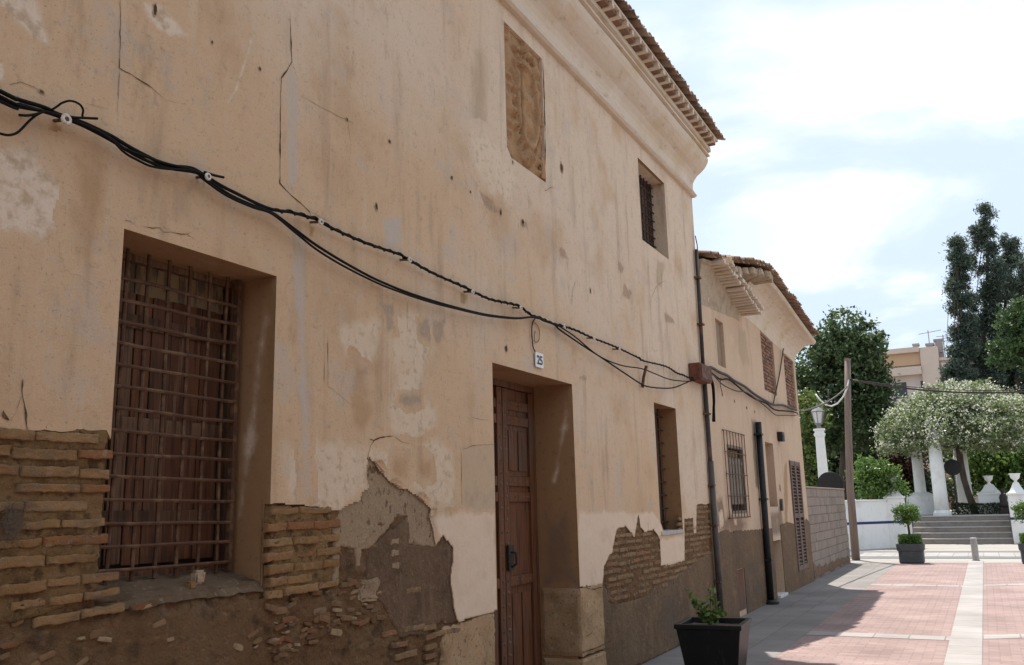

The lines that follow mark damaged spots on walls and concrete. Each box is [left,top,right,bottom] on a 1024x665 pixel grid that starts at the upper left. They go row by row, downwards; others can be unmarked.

crack [90,7,176,109]
crack [279,24,328,221]
flaking render [0,426,166,665]
flaking render [233,459,495,665]
flaking render [603,504,737,604]